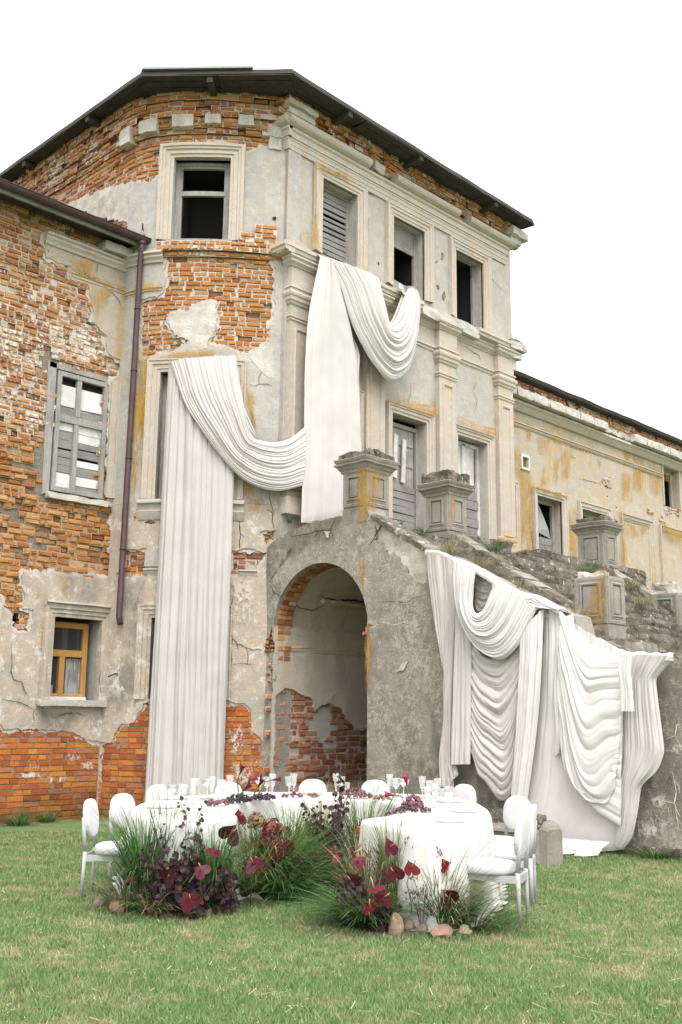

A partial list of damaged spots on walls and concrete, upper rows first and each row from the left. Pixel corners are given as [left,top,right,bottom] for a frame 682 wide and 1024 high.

flaking render [13,91,512,234]
flaking render [140,217,283,378]
flaking render [0,200,119,631]
flaking render [515,379,682,452]
crack [3,666,84,720]
flaking render [262,563,367,790]